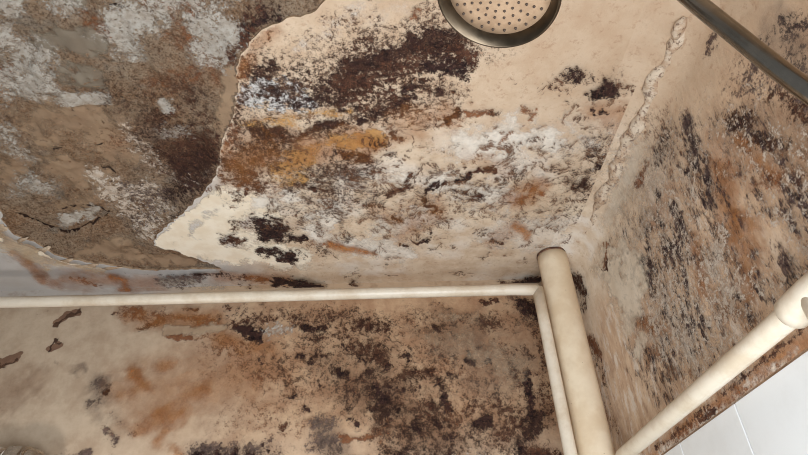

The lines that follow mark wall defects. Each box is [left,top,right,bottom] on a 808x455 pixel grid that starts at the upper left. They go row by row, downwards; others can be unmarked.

spalling [0,0,323,272]
corrosion [270,129,388,186]
water stain [100,0,808,408]
peeling [0,351,23,369]
peeling [46,338,63,352]
peeling [53,308,82,327]
corrosion [111,305,219,330]
water stain [187,421,290,455]
corrosion [196,336,321,432]
water stain [219,295,562,455]
water stain [587,334,619,434]
water stain [654,328,804,455]